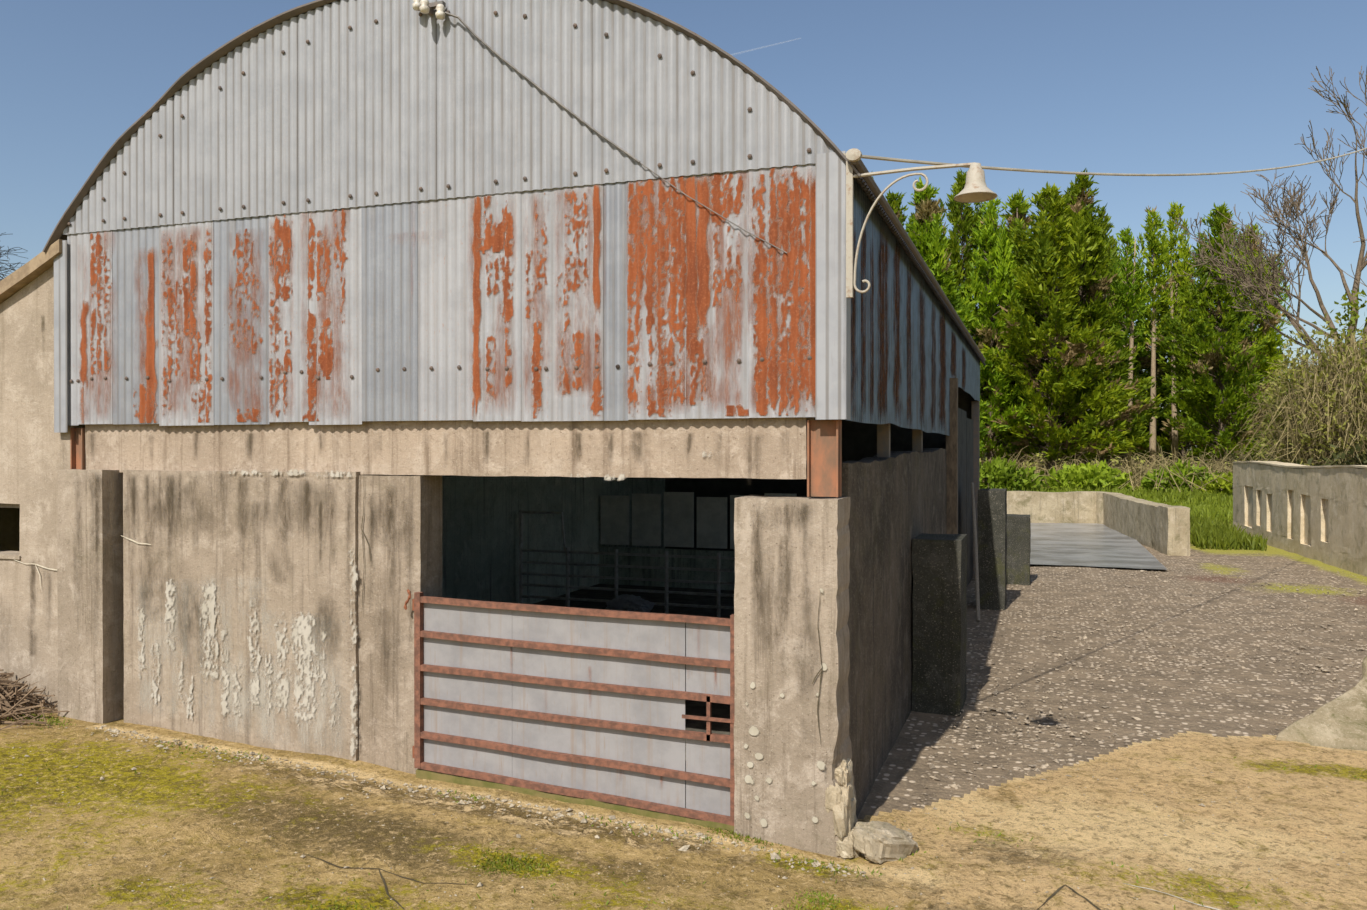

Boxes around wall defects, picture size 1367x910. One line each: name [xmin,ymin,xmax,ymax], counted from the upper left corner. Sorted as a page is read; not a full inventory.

corrosion [79,232,112,423]
corrosion [133,209,348,423]
corrosion [472,185,604,418]
corrosion [627,166,816,417]